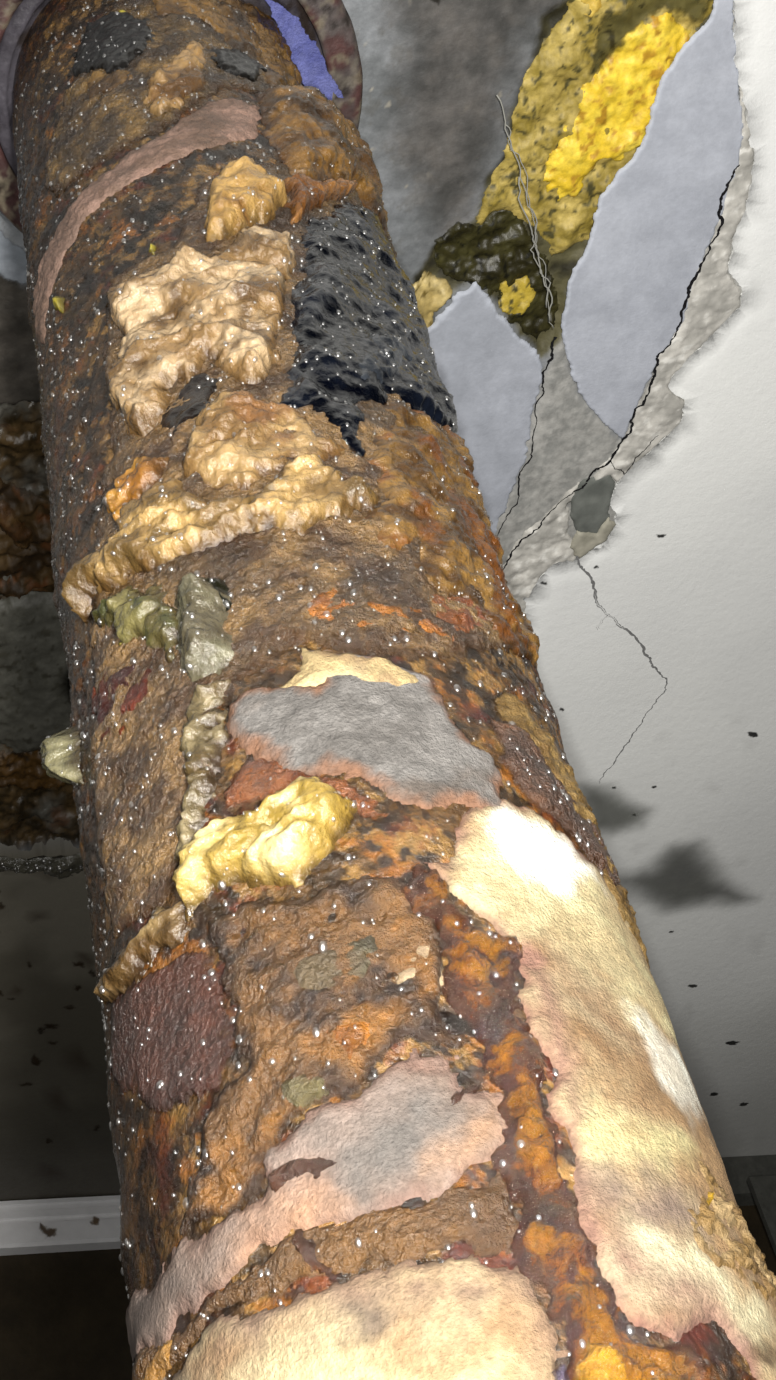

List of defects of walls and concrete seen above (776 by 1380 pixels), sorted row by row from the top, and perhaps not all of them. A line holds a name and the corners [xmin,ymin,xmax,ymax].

rust [152,0,397,258]
spalling [0,212,50,500]
spalling [342,0,754,614]
spalling [0,725,84,851]
rust [174,573,234,682]
rust [223,758,388,820]
rust [308,400,540,669]
rust [495,691,650,969]
crack [576,556,668,784]
rust [109,875,470,1236]
rust [132,1170,519,1380]
rust [688,1154,776,1301]